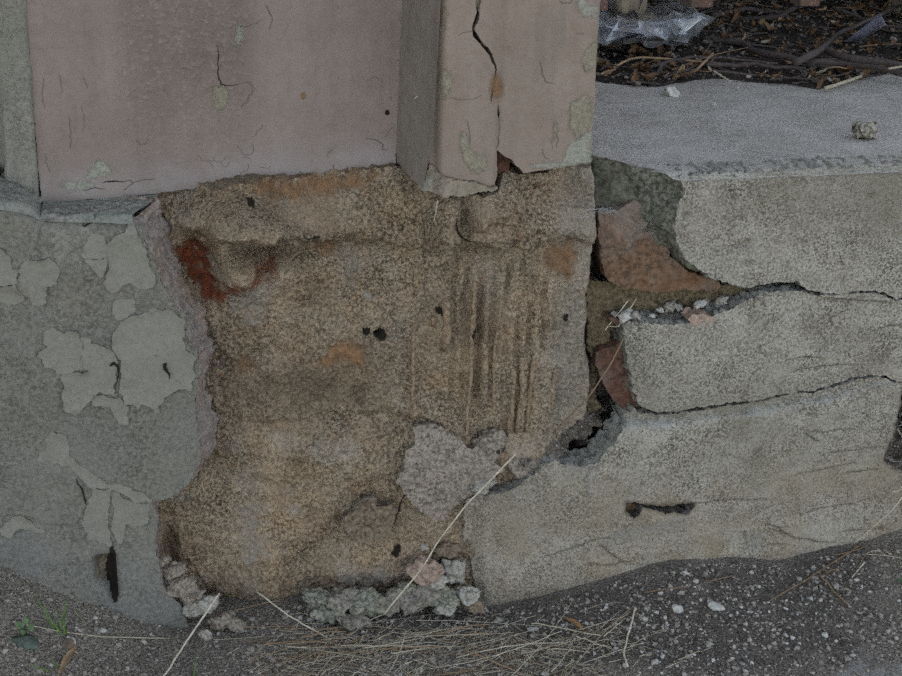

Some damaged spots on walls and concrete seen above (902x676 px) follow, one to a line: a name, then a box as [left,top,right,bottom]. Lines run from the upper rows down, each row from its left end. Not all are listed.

crack [456,0,500,149]
peeling [0,248,60,307]
spalling [37,131,596,603]